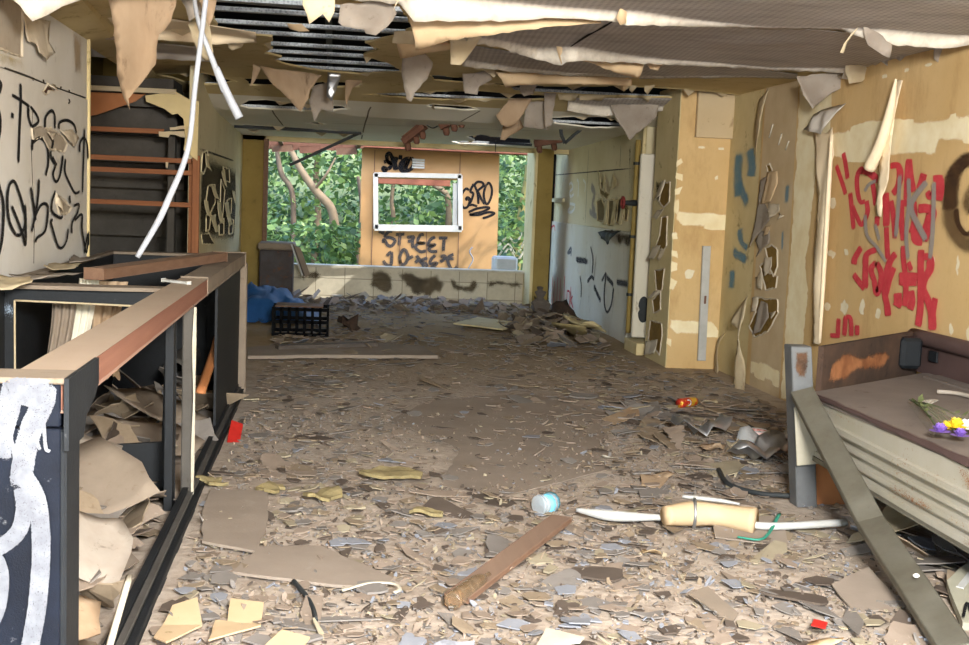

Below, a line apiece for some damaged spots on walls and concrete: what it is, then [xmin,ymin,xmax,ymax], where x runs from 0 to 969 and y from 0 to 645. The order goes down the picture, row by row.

peeling [749,80,799,398]